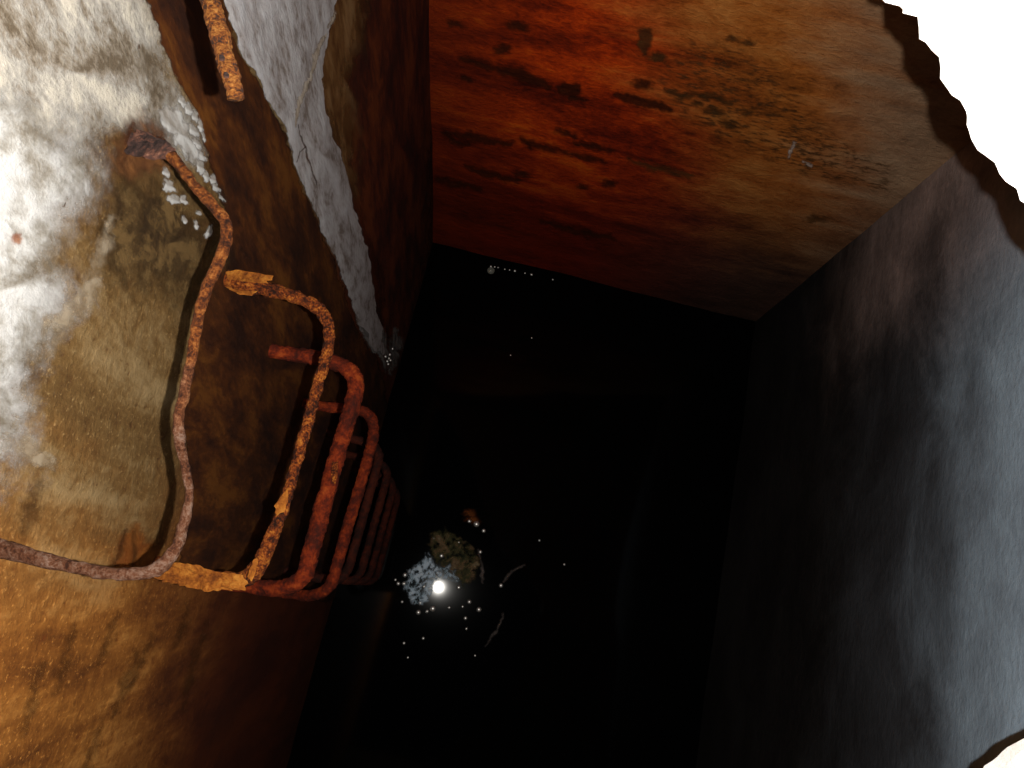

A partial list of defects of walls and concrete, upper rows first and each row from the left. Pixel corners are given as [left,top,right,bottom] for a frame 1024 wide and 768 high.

water stain [637,28,665,62]
rust [102,120,217,308]
water stain [0,0,615,602]
rust [117,531,152,568]